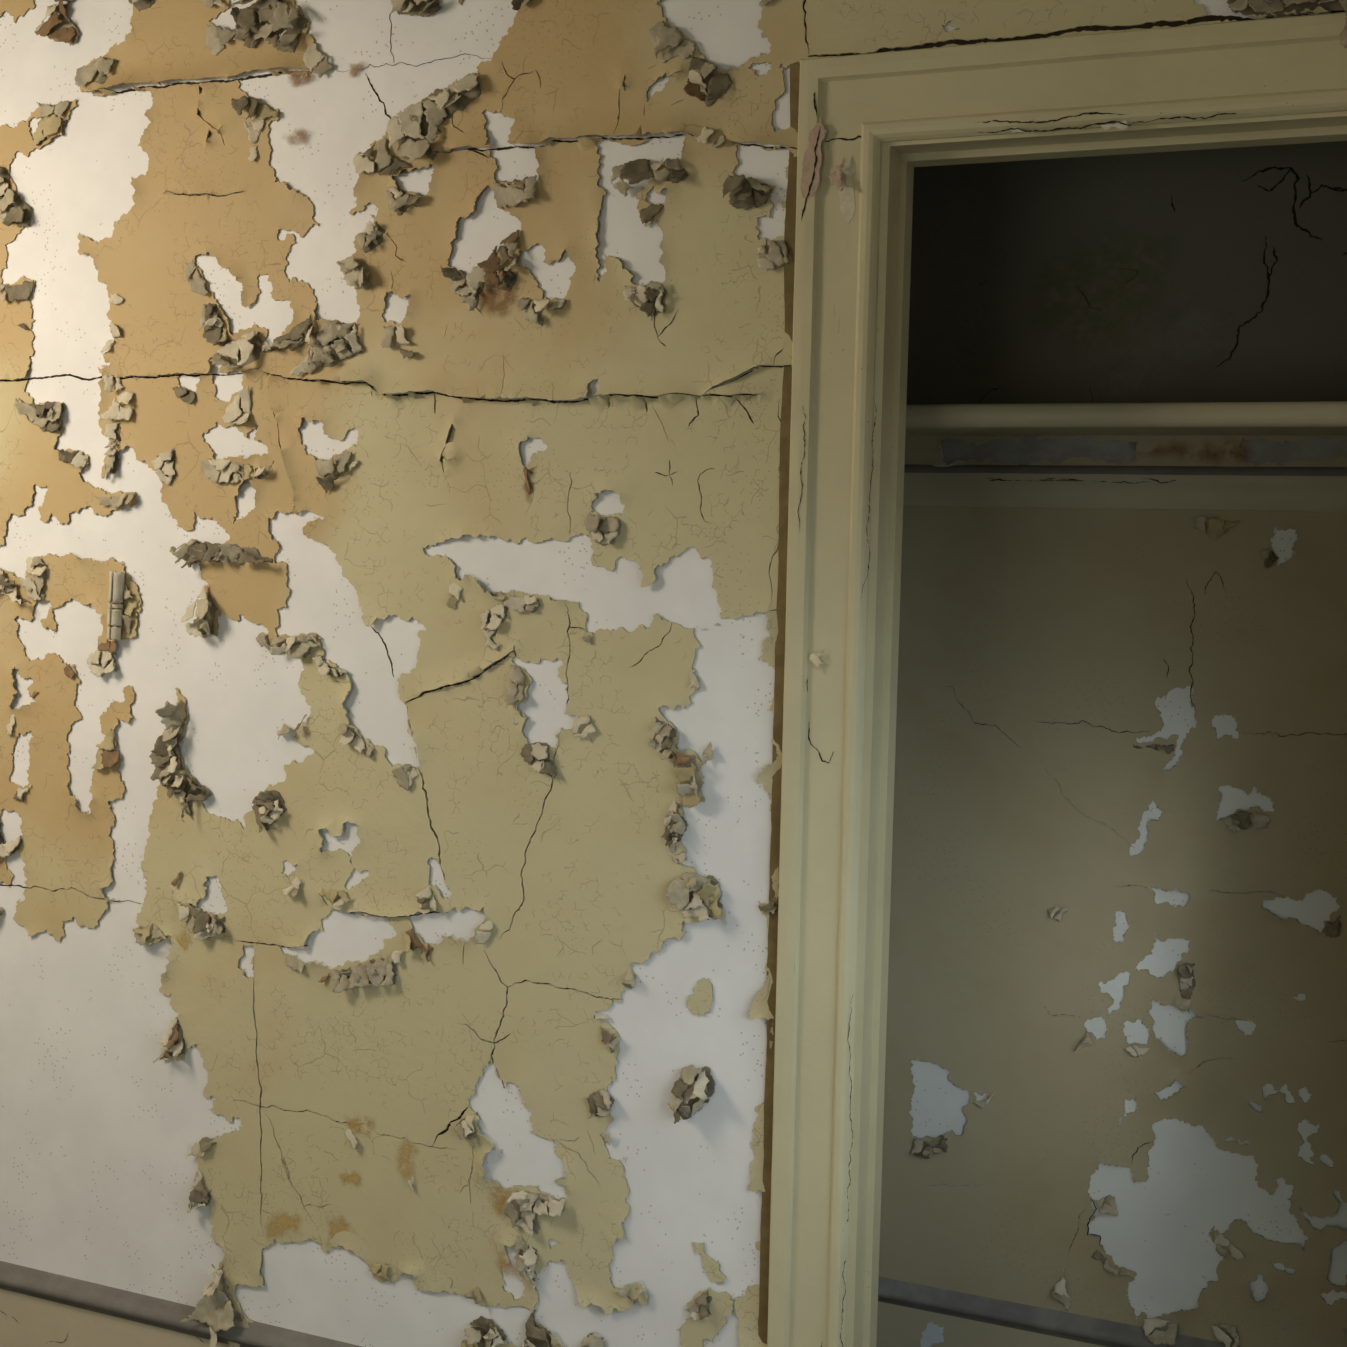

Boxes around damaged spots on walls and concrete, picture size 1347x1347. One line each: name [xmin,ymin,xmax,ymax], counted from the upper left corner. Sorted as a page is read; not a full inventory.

crack [803,0,1346,57]
crack [437,124,693,158]
flaking render [597,117,844,321]
crack [736,93,861,220]
crack [977,112,1236,133]
crack [0,366,806,611]
flaking render [0,0,790,1347]
crack [371,626,516,726]
flaking render [1132,686,1239,770]
flaking render [1084,933,1203,1059]
flaking render [910,1059,995,1159]
flaking render [1088,1118,1347,1347]